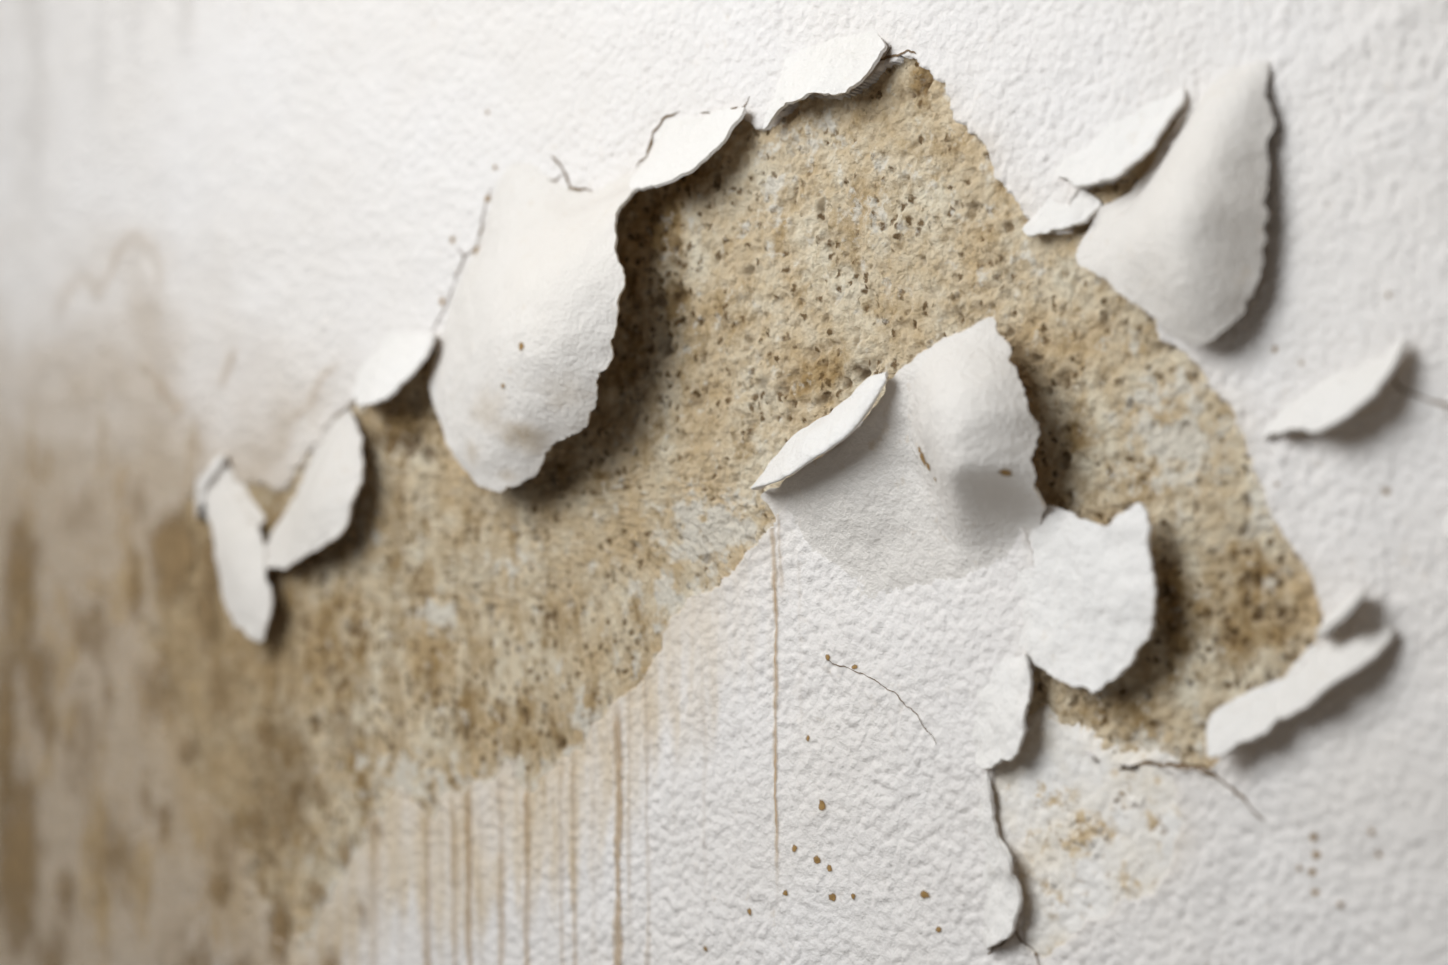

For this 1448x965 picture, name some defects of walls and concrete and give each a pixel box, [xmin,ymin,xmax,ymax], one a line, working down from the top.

peeling [1262,339,1406,441]
crack [1392,379,1448,413]
spalling [142,27,1324,958]
peeling [1315,586,1368,636]
water stain [0,420,264,965]
crack [828,660,936,743]
peeling [1206,624,1394,759]
crack [1118,760,1264,820]
water stain [614,721,622,965]
water stain [270,901,290,961]